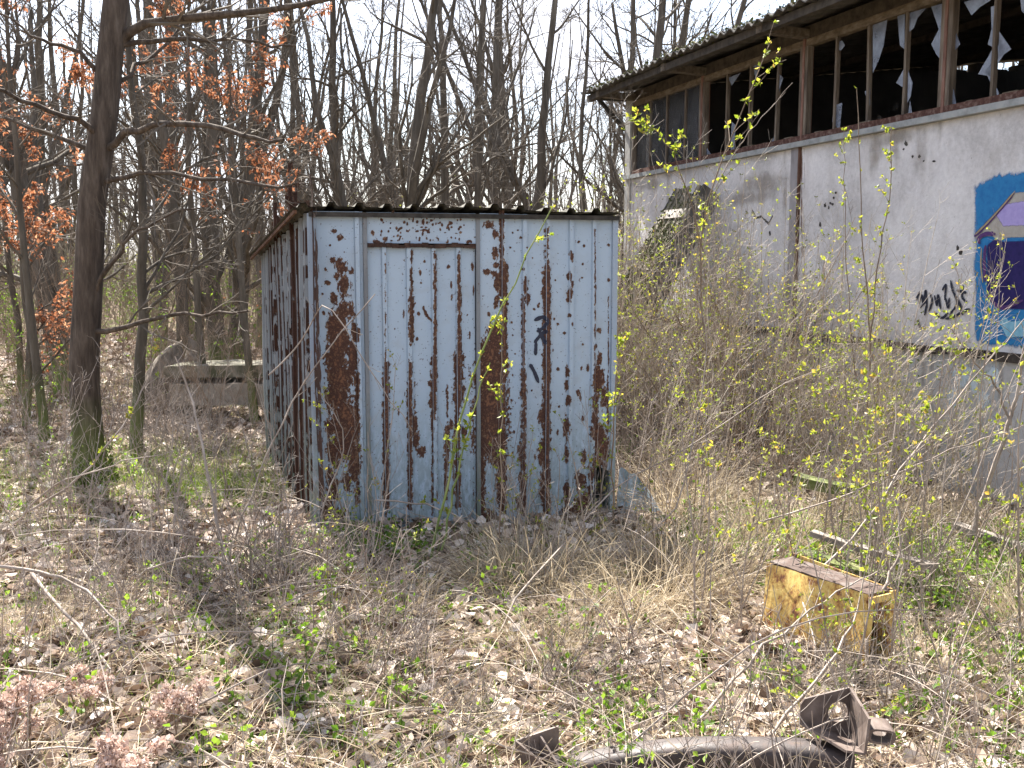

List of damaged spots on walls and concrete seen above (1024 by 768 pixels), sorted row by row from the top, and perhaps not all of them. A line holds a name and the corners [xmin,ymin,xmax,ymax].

rust [264,162,363,528]
rust [371,210,610,523]